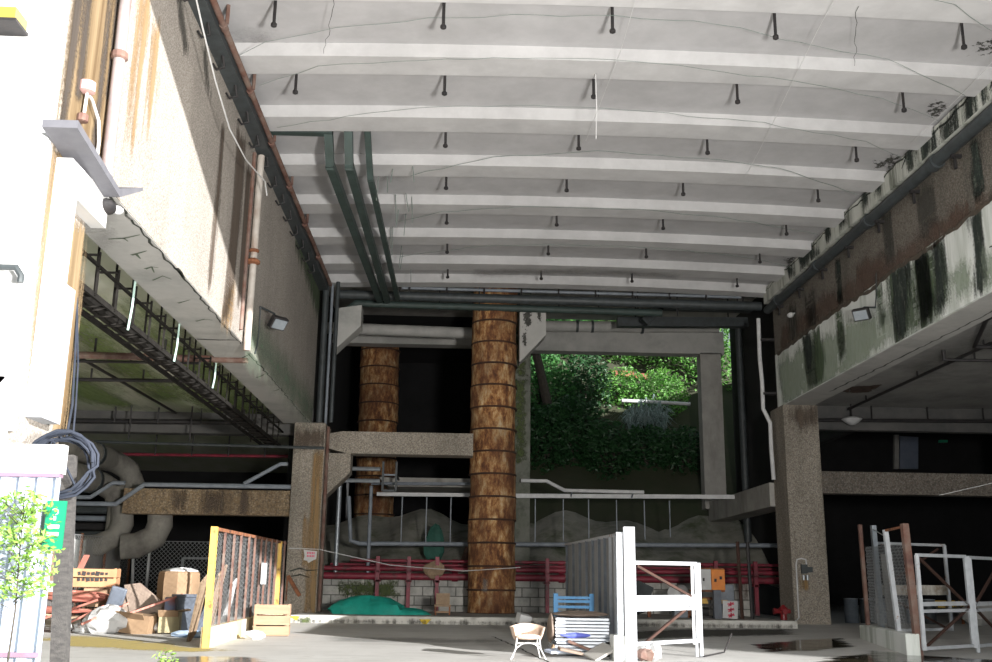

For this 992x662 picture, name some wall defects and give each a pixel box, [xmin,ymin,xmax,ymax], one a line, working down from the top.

corrosion [781,194,987,348]
leakage [883,183,947,341]
leakage [967,139,989,295]